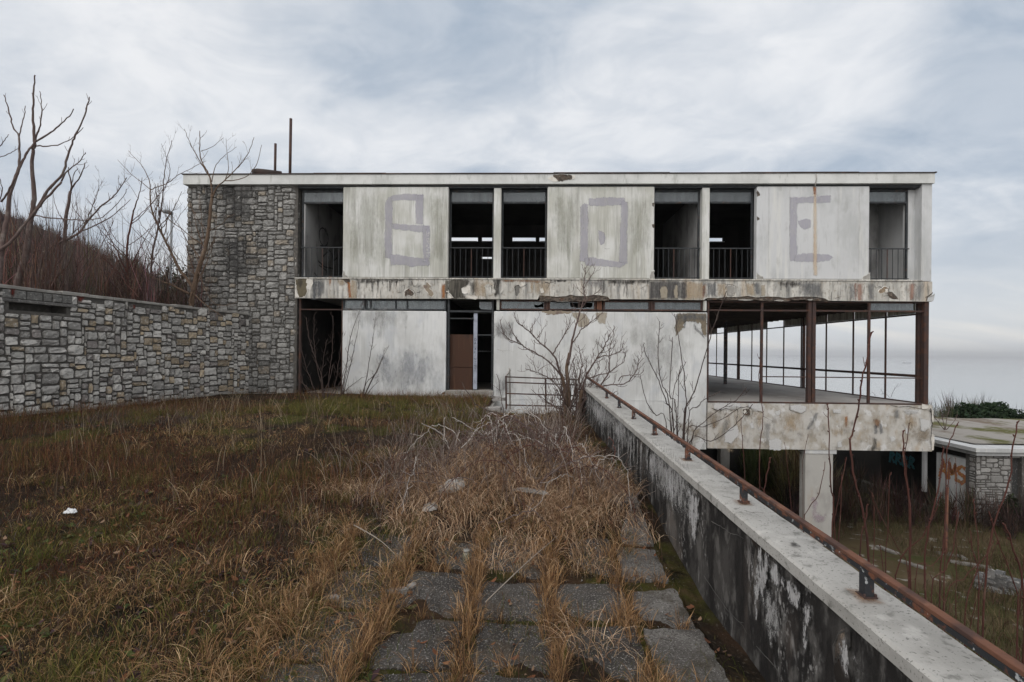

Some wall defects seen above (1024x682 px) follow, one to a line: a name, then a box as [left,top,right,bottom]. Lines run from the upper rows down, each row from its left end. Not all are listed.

peeling [295,279,313,298]
spalling [342,270,356,298]
peeling [397,279,478,300]
peeling [862,273,898,299]
peeling [675,313,707,336]
water stain [586,394,699,540]
water stain [751,548,810,649]
water stain [839,641,849,674]